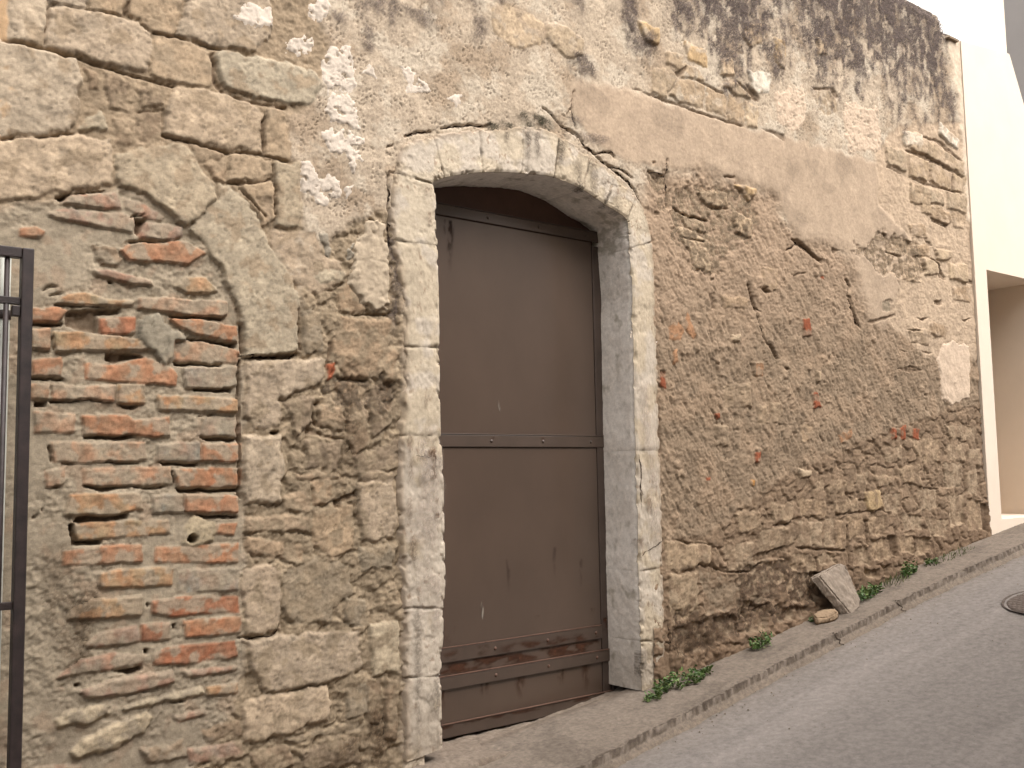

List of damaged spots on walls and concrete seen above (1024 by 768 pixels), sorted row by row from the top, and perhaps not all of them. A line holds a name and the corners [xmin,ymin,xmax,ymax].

damp [622,0,657,53]
damp [671,0,956,124]
crack [544,93,701,221]
spalling [860,234,924,277]
rust [442,636,597,674]